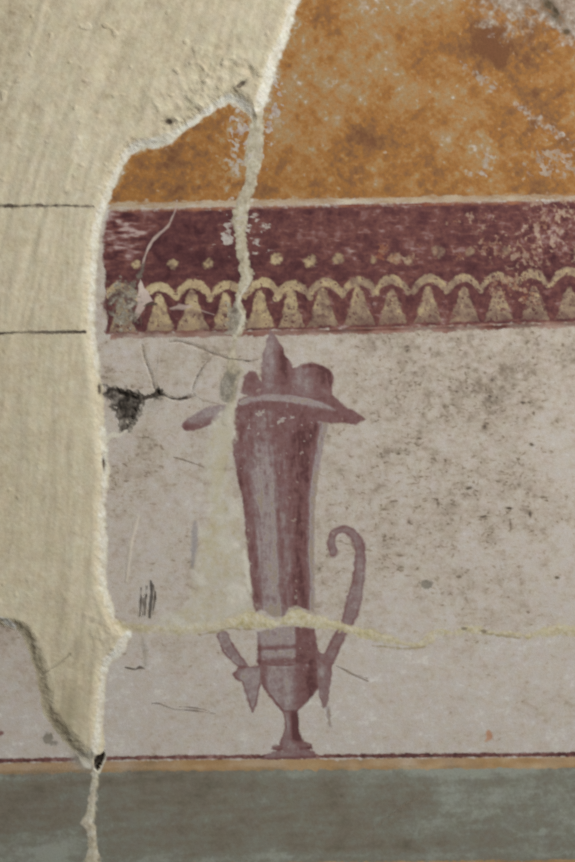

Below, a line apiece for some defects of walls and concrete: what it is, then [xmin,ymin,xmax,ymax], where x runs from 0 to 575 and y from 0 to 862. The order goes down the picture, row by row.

spalling [159,115,177,128]
spalling [230,77,252,93]
crack [129,199,179,293]
crack [140,71,290,406]
peeling [101,274,194,334]
spalling [95,380,168,478]
crack [111,607,575,652]
crack [79,773,103,862]